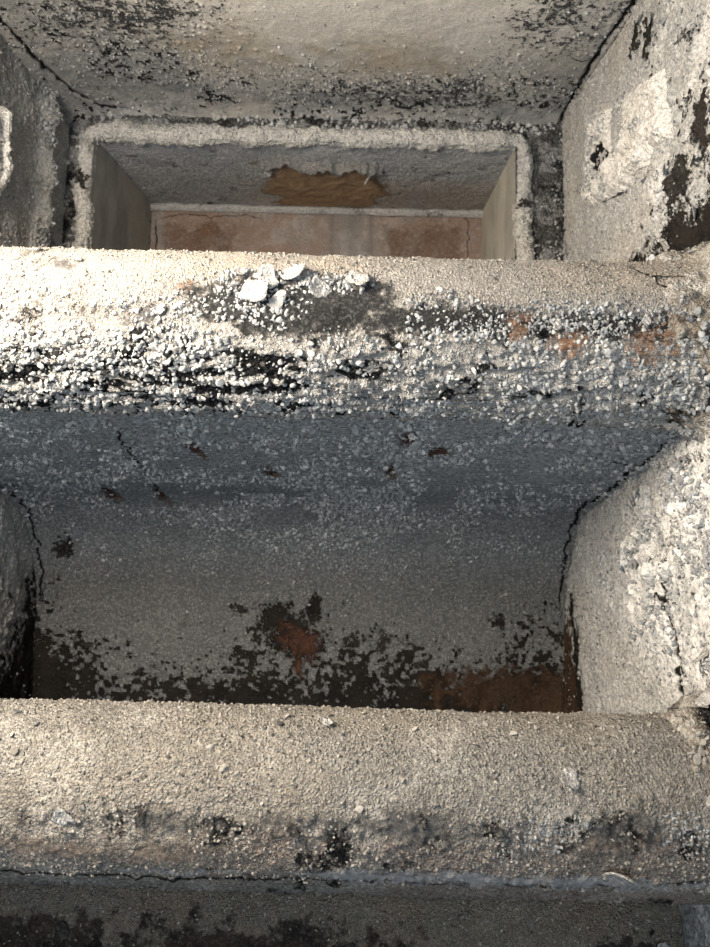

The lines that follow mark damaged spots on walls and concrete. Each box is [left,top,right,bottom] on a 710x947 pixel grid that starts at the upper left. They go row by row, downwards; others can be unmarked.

peeling [250,152,389,207]
crack [0,485,45,602]
crack [558,443,666,617]
corrosion [418,660,564,713]
crack [1,868,568,889]
crack [593,881,709,890]